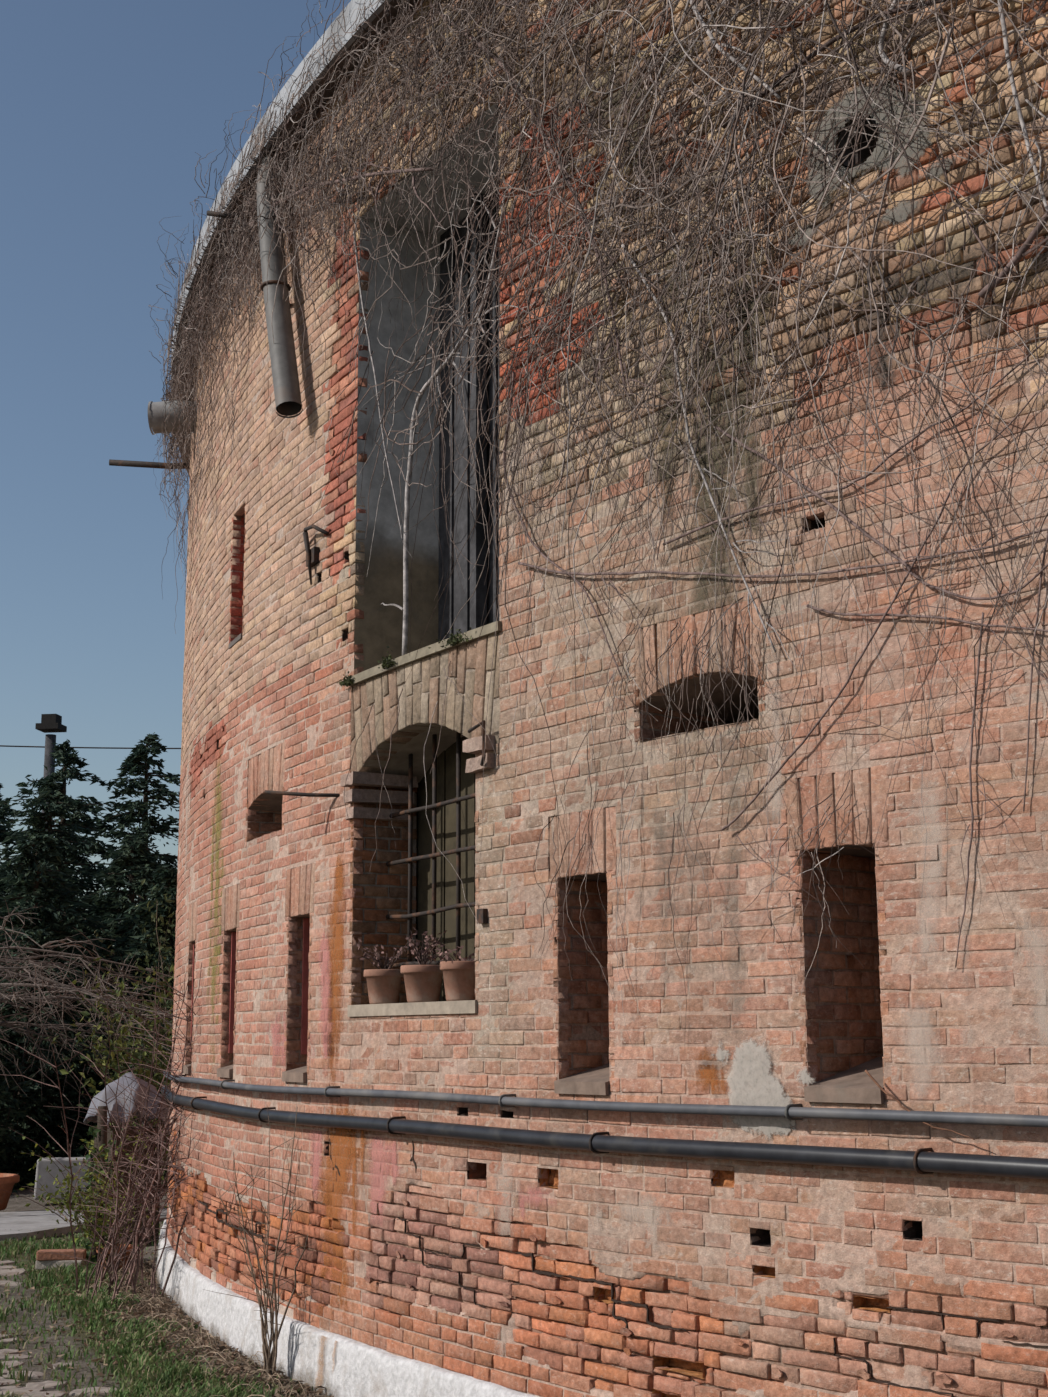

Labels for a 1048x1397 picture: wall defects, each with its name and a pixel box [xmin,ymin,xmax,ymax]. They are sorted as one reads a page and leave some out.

damp [696,289,758,602]
crack [517,1252,687,1331]
crack [886,1307,1048,1347]
crack [832,1338,954,1397]